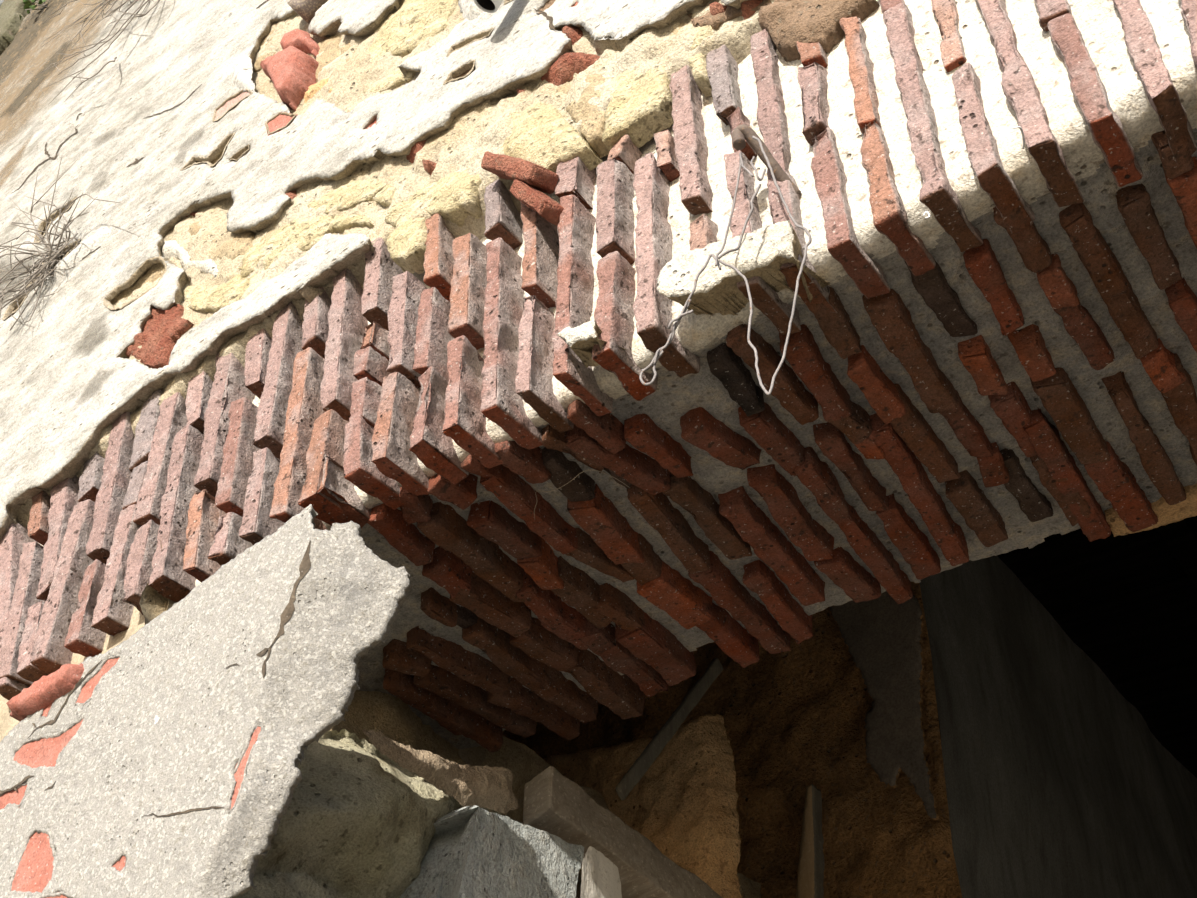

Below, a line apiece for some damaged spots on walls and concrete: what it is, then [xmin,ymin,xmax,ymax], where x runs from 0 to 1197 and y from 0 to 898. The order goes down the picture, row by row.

spalling [446,28,494,57]
spalling [443,60,475,85]
spalling [212,88,253,122]
spalling [265,112,298,136]
spalling [180,133,251,171]
spalling [103,256,167,310]
crack [226,540,311,678]
spalling [0,654,123,811]
spalling [226,725,264,814]
spalling [8,827,78,898]
spalling [111,855,126,871]